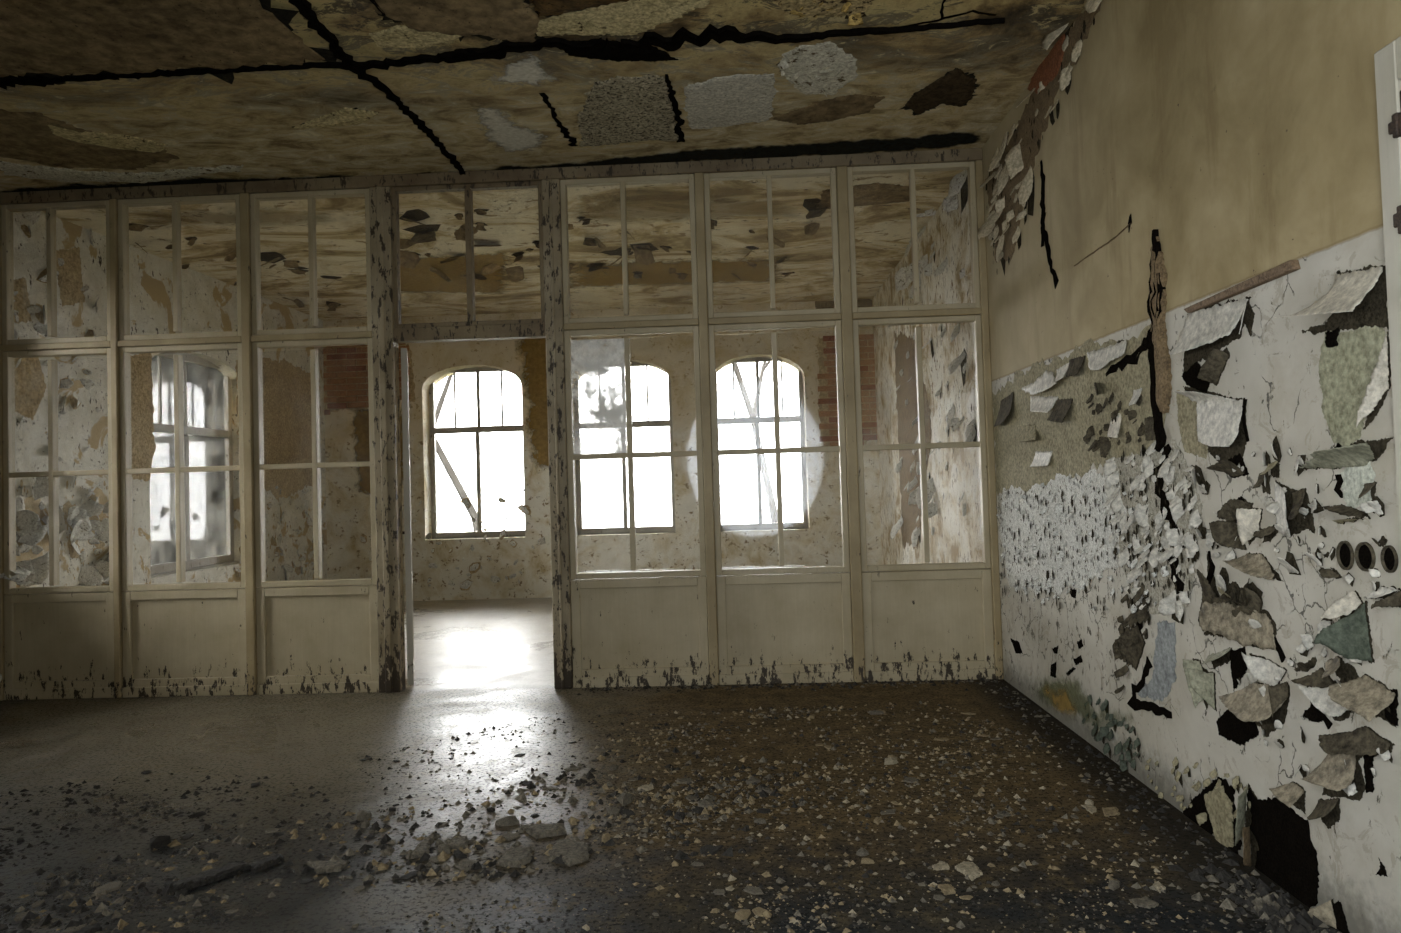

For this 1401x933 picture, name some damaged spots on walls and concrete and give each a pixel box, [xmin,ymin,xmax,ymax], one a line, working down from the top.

spalling [536,0,710,37]
peeling [775,0,874,26]
crack [0,0,1005,175]
spalling [773,41,885,125]
peeling [853,0,1102,305]
spalling [803,189,831,236]
spalling [815,300,834,309]
spalling [816,336,839,455]
spalling [857,264,1401,933]